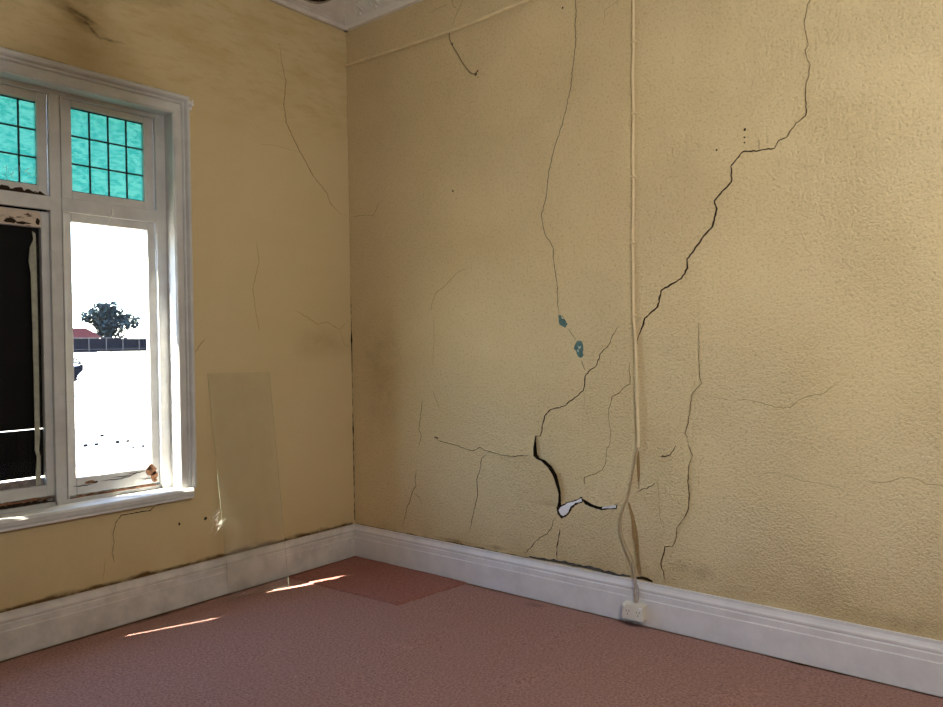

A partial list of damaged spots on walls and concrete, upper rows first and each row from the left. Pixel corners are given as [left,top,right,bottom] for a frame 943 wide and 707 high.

crack [263,45,378,228]
crack [419,0,810,530]
crack [349,383,357,472]
crack [523,516,560,558]
spalling [556,496,617,519]
crack [637,323,834,580]